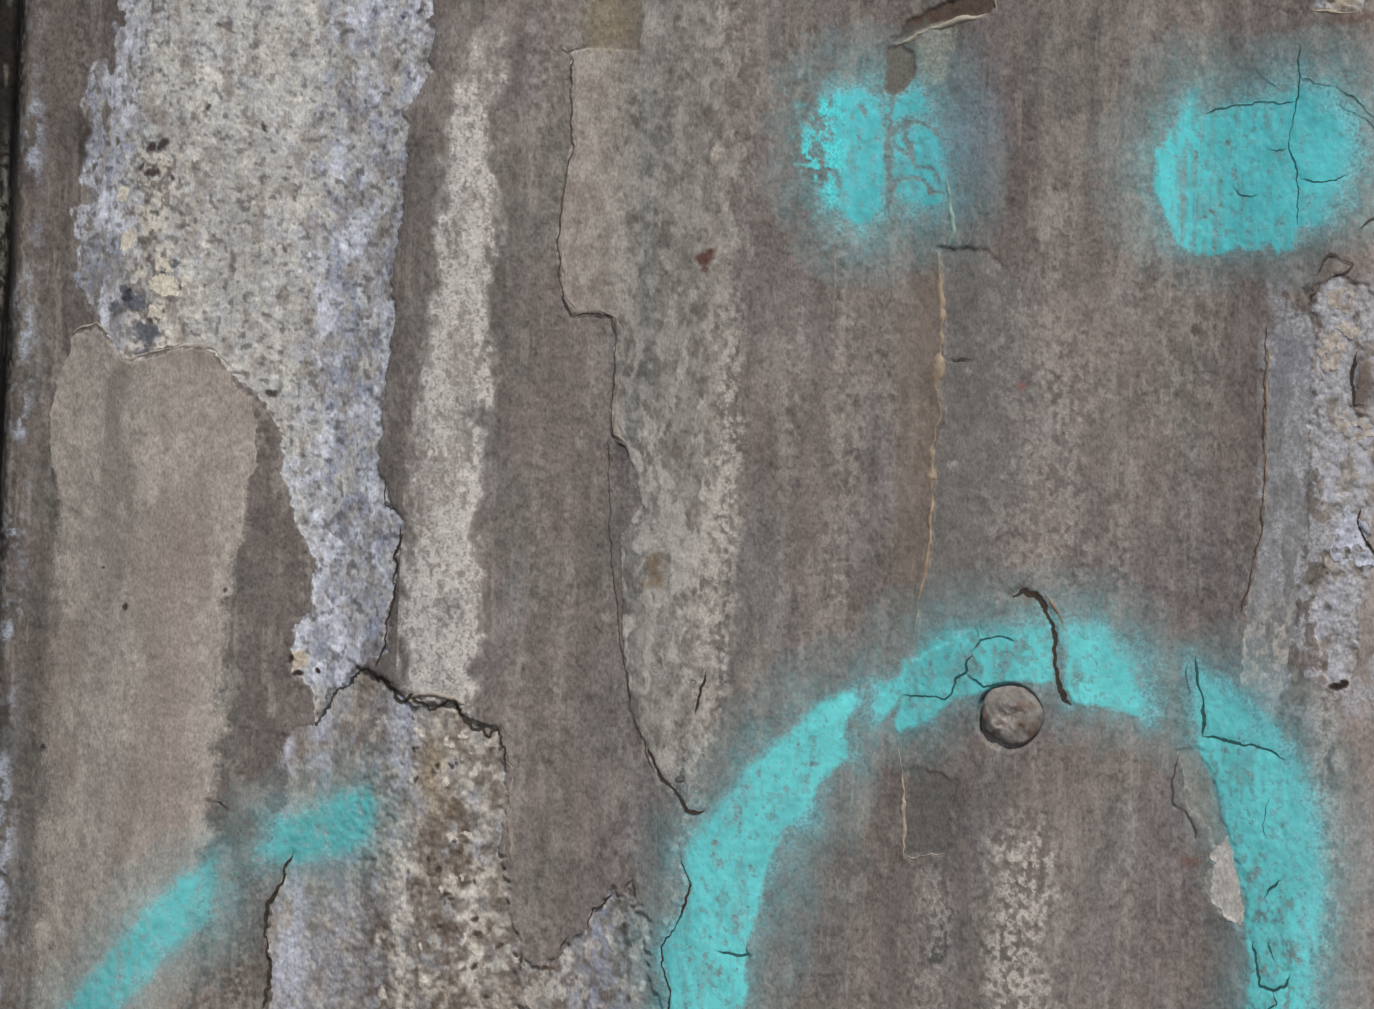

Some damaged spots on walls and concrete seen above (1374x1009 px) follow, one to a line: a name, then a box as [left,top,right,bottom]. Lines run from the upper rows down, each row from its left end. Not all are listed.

spalling [885,0,997,95]
crack [1208,44,1374,223]
peeling [1313,0,1368,14]
peeling [555,0,749,783]
peeling [31,0,662,1009]
crack [904,629,1015,700]
crack [1012,588,1072,705]
spalling [1177,747,1247,931]
crack [1171,658,1285,840]
peeling [1240,273,1374,1009]